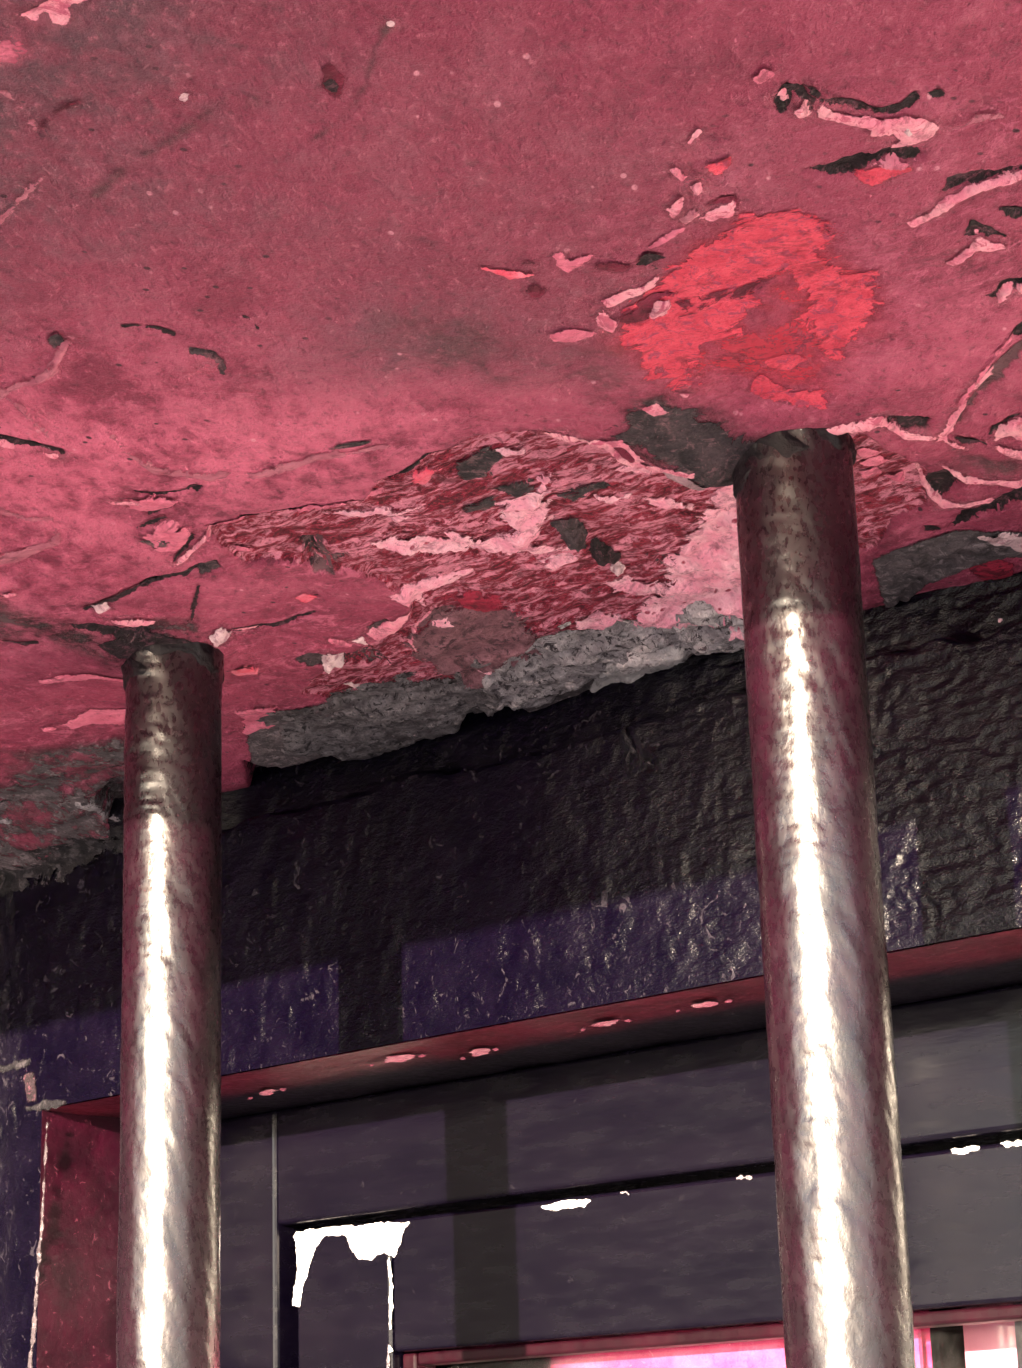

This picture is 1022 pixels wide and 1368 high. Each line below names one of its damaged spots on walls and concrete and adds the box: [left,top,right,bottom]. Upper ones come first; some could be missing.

peeling [20,0,87,25]
peeling [0,36,27,63]
spalling [753,69,1005,148]
peeling [685,129,702,147]
peeling [481,156,885,410]
spalling [826,413,1022,549]
crack [924,487,1022,531]
spalling [108,430,744,698]
peeling [38,674,123,684]
peeling [41,709,126,732]
peeling [234,707,279,735]
peeling [292,1222,410,1368]